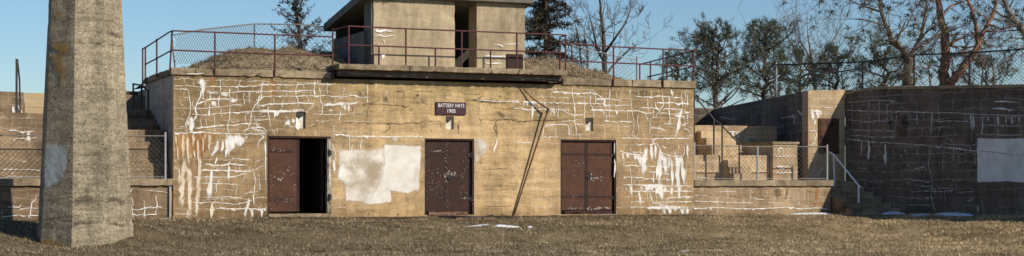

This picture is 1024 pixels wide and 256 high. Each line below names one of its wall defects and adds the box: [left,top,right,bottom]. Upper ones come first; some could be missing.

rust [175,133,215,160]
damp [175,117,247,218]
crack [131,80,824,216]
damp [614,141,689,214]